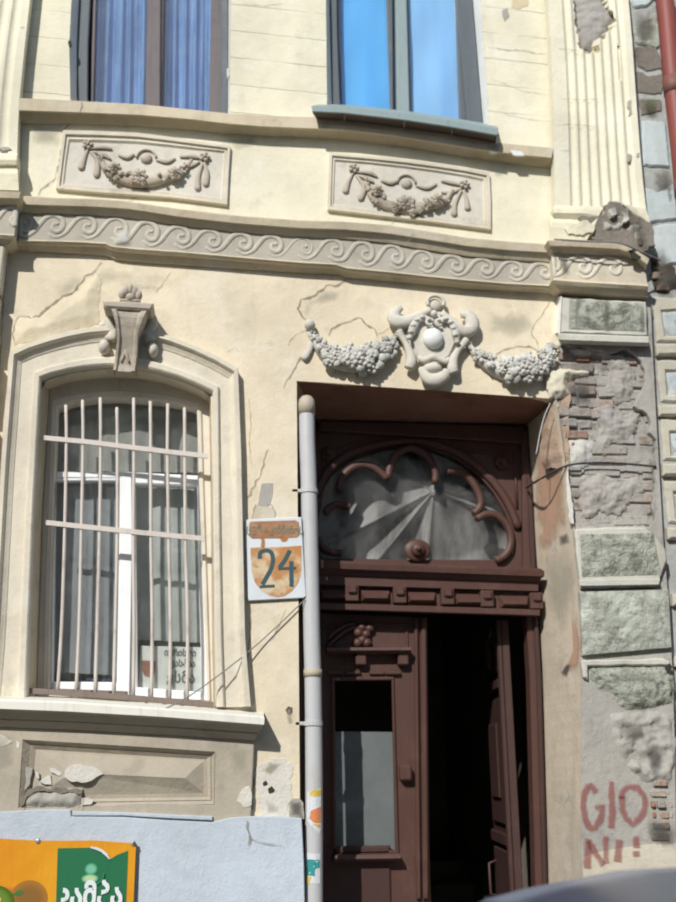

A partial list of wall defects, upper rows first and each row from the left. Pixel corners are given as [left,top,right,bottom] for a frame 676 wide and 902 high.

flaking render [573,0,614,54]
crack [0,262,102,361]
crack [283,280,345,388]
crack [329,317,391,337]
crack [496,301,550,354]
flaking render [540,345,654,549]
spalling [20,764,103,809]
peeling [237,758,304,819]